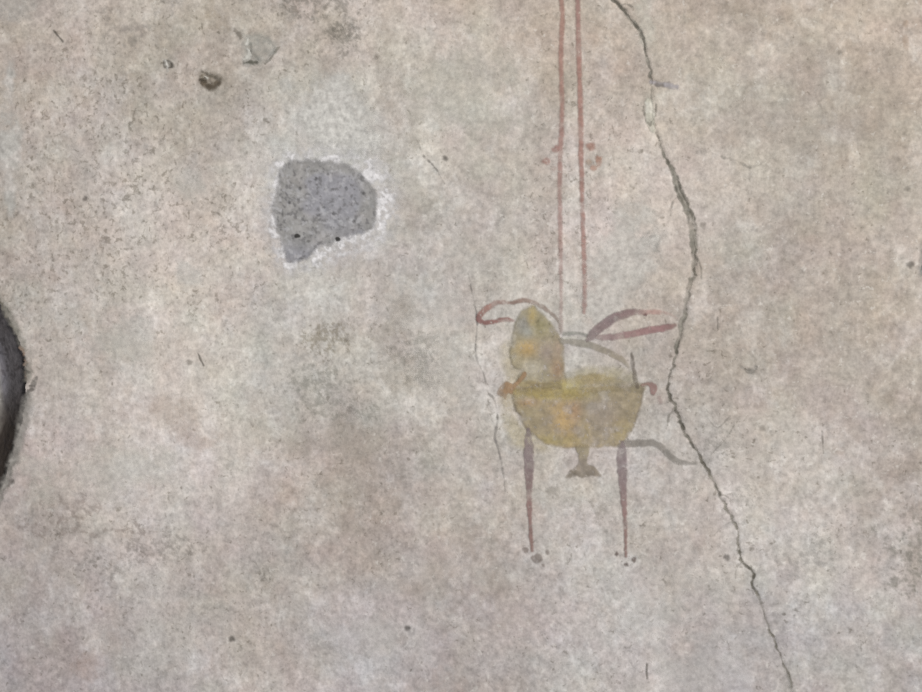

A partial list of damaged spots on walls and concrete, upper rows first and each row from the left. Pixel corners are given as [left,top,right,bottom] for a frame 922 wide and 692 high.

crack [611,0,697,285]
flaking render [0,302,37,501]
crack [667,311,759,595]
crack [769,630,792,689]